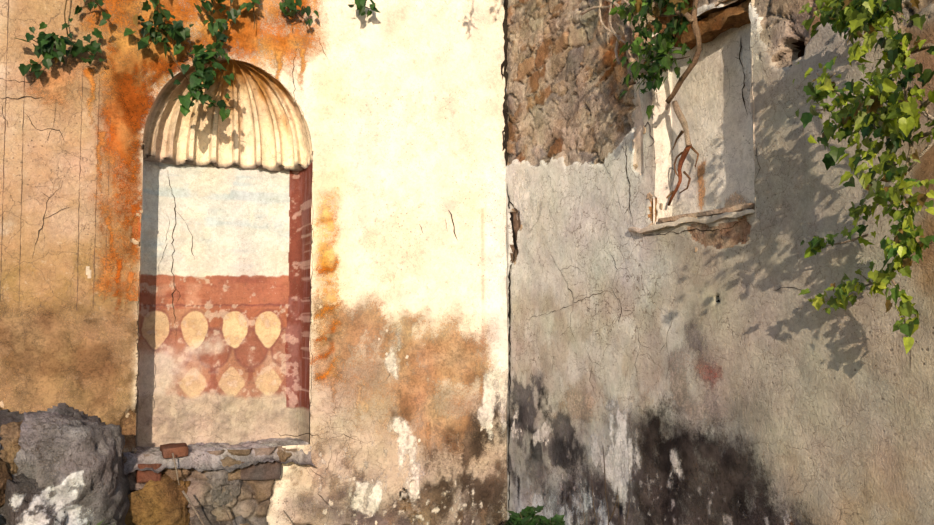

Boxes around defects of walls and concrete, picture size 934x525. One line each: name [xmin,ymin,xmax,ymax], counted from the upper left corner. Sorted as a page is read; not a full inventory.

crack [1,79,64,140]
corrosion [32,0,324,303]
crack [32,180,69,258]
crack [136,177,195,430]
flaking render [510,170,543,265]
crack [501,0,631,515]
water stain [310,301,494,457]
water stain [668,323,725,420]
water stain [298,440,440,525]
water stain [454,509,505,525]
water stain [532,385,711,525]